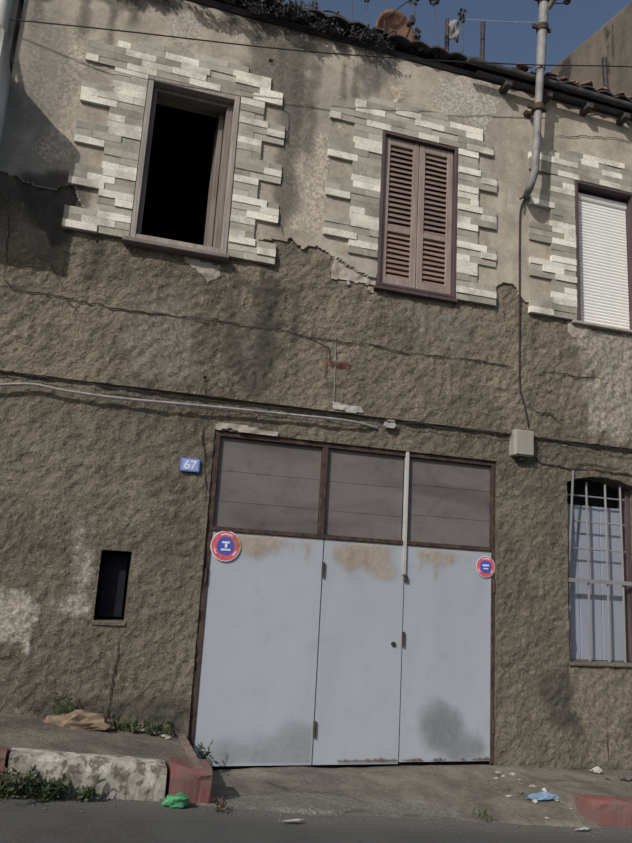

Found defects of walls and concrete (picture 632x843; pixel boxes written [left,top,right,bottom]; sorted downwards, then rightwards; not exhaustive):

damp [431,78,502,129]
crack [561,134,632,142]
peeling [184,256,221,283]
crack [3,217,512,367]
peeling [331,256,378,293]
corrosion [325,348,350,373]
crack [536,370,595,378]
peeling [0,589,40,654]